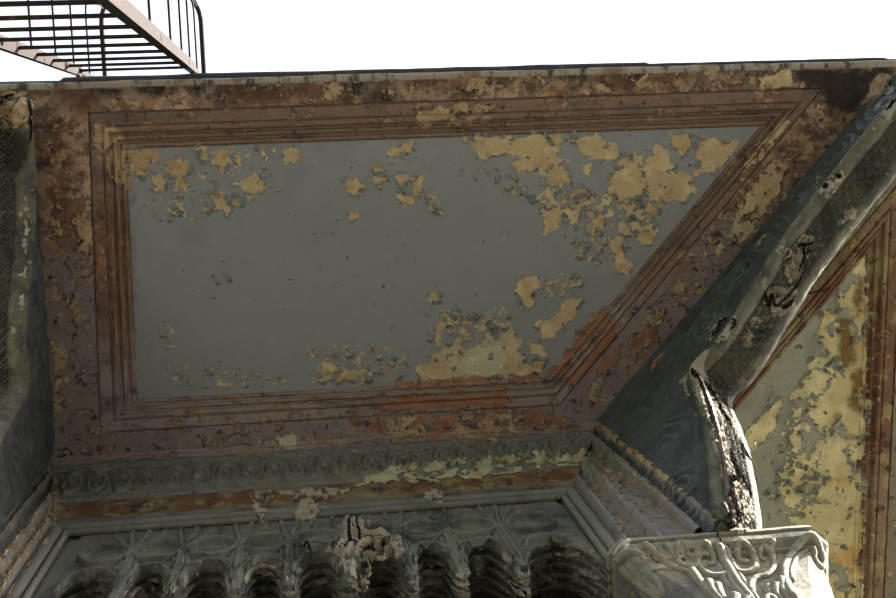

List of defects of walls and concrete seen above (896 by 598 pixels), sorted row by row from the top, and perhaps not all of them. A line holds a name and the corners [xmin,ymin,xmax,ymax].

peeling [243,81,357,103]
leakage [793,67,896,118]
peeling [91,121,302,223]
peeling [45,141,112,437]
peeling [307,63,824,445]
flaking render [325,515,405,592]
peeling [250,420,687,555]
crack [691,368,753,542]
peeling [679,234,896,598]